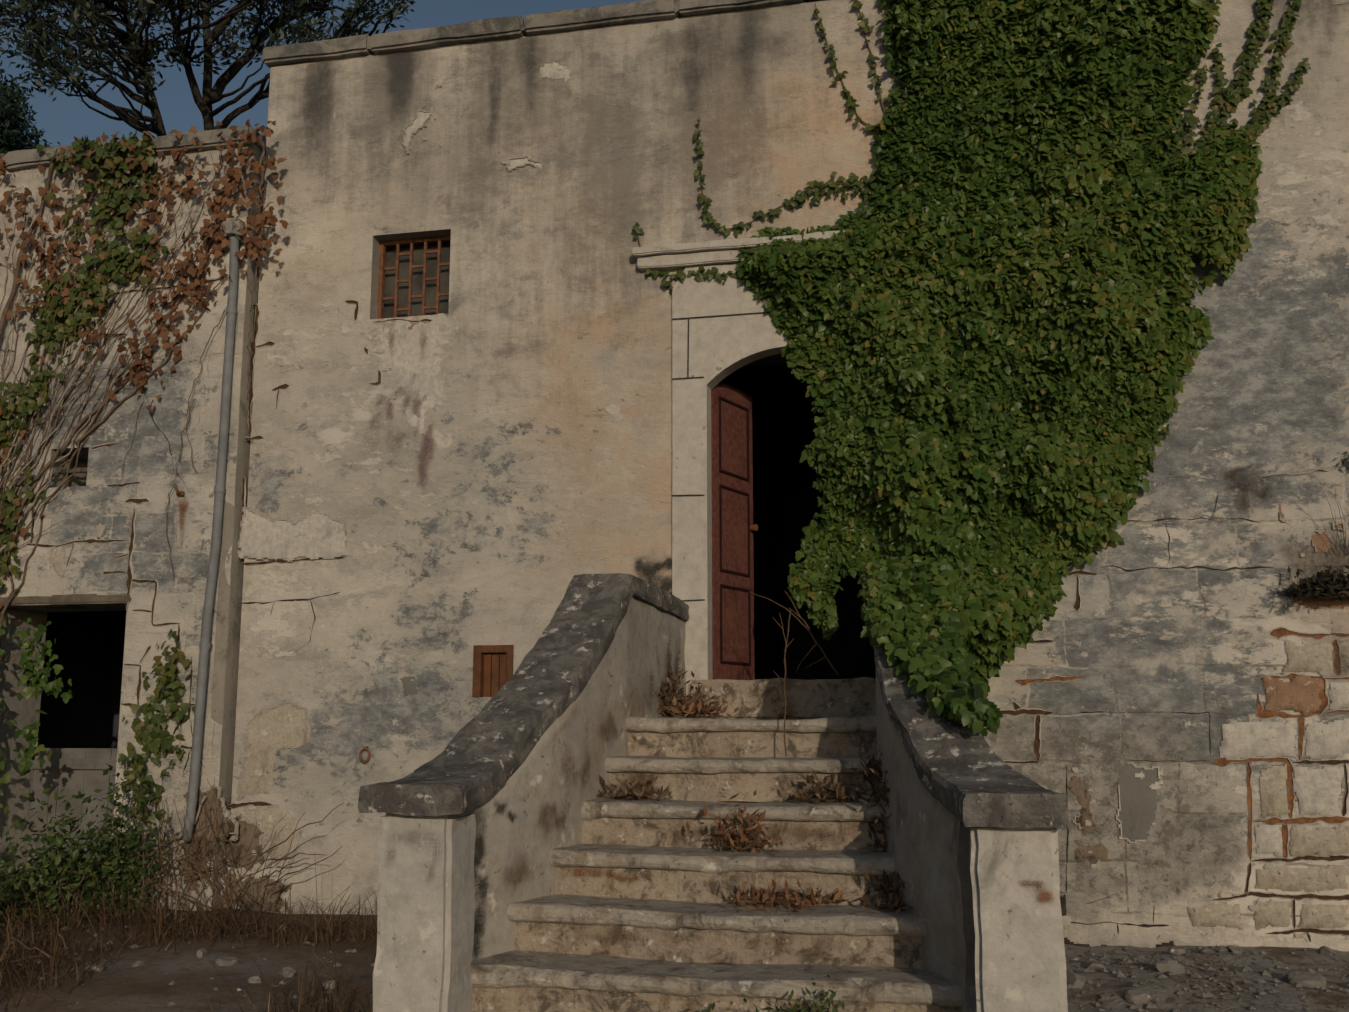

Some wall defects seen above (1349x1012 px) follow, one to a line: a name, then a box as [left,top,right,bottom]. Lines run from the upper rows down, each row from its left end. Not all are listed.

crack [106,277,229,297]
crack [245,304,289,441]
crack [26,394,204,773]
crack [237,592,339,653]
crack [239,477,345,566]
crack [1064,495,1274,611]
crack [1000,638,1169,935]
spalling [1068,762,1163,868]
crack [1132,626,1349,942]
spalling [1187,640,1349,938]